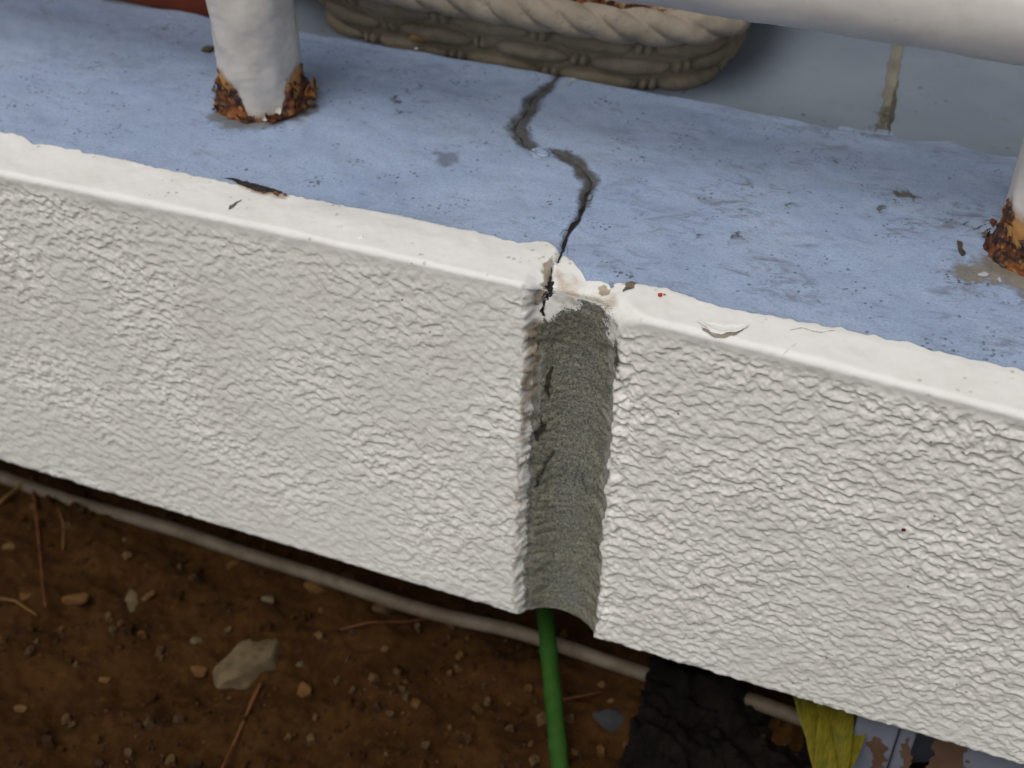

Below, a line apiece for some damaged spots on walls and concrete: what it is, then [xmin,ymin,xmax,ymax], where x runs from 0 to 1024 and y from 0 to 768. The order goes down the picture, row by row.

rust [211,63,318,123]
leakage [887,81,898,134]
spalling [227,178,287,198]
crack [514,77,593,312]
rust [981,198,1024,277]
peeling [697,319,748,338]